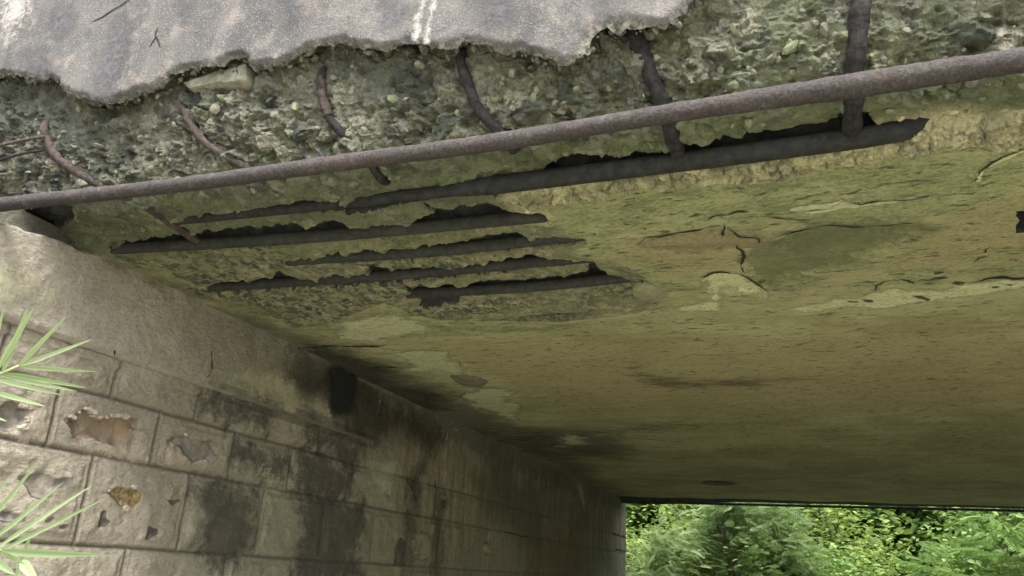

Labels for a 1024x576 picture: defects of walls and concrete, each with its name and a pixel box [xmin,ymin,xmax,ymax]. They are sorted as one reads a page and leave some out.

spalling [864,0,1024,71]
spalling [0,0,851,197]
spalling [22,73,1024,328]
crack [637,150,1024,291]
damp [335,312,467,375]
spalling [0,402,51,444]
spalling [64,407,149,463]
spalling [161,432,217,467]
damp [188,346,443,576]
damp [462,387,521,420]
spalling [107,484,141,512]